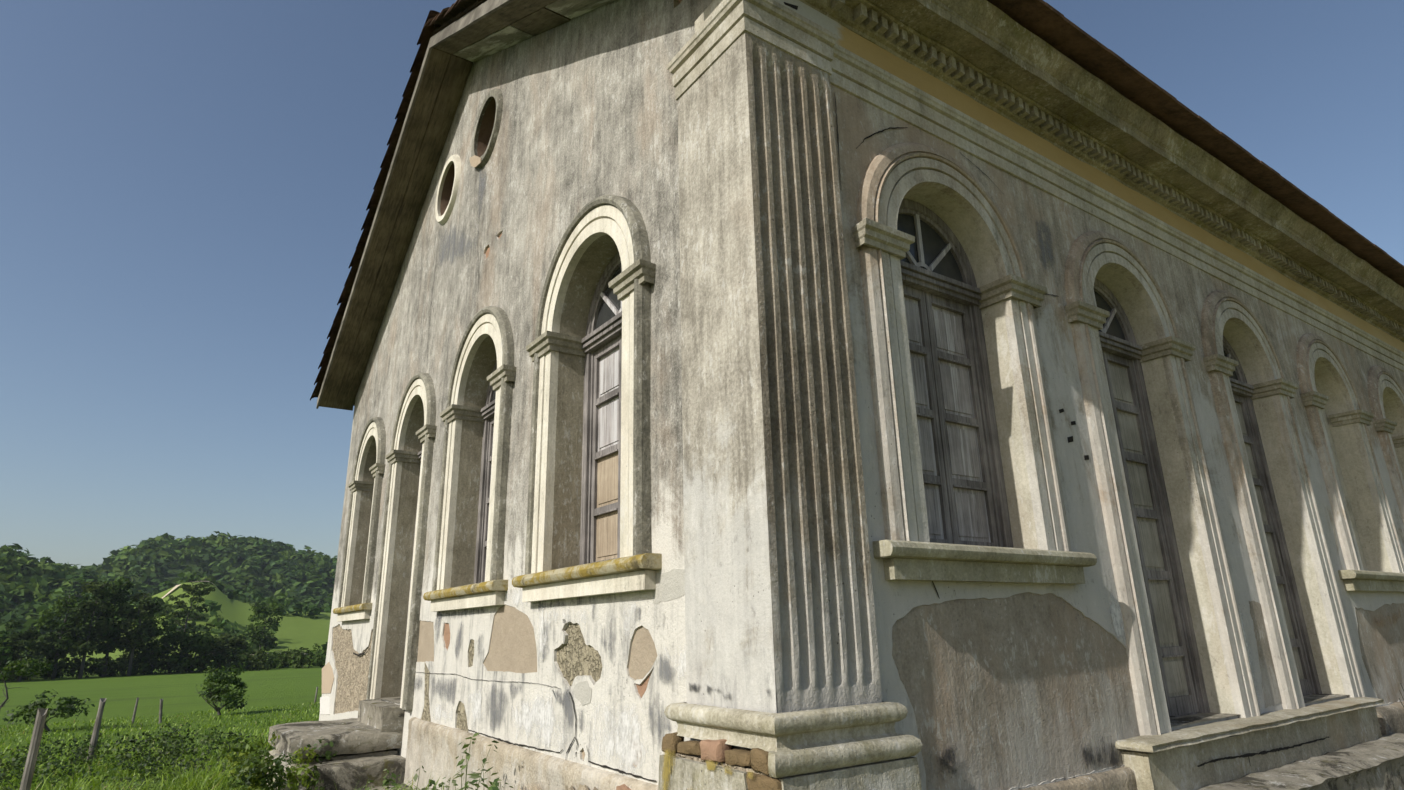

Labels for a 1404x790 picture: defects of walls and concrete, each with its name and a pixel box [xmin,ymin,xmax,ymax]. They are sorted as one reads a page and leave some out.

spalling [320,624,373,715]
flaking render [468,604,537,673]
damp [414,680,670,771]
spalling [554,619,603,688]
flaking render [627,625,658,700]
damp [659,650,730,698]
flaking render [661,732,784,790]
flaking render [892,592,1140,790]